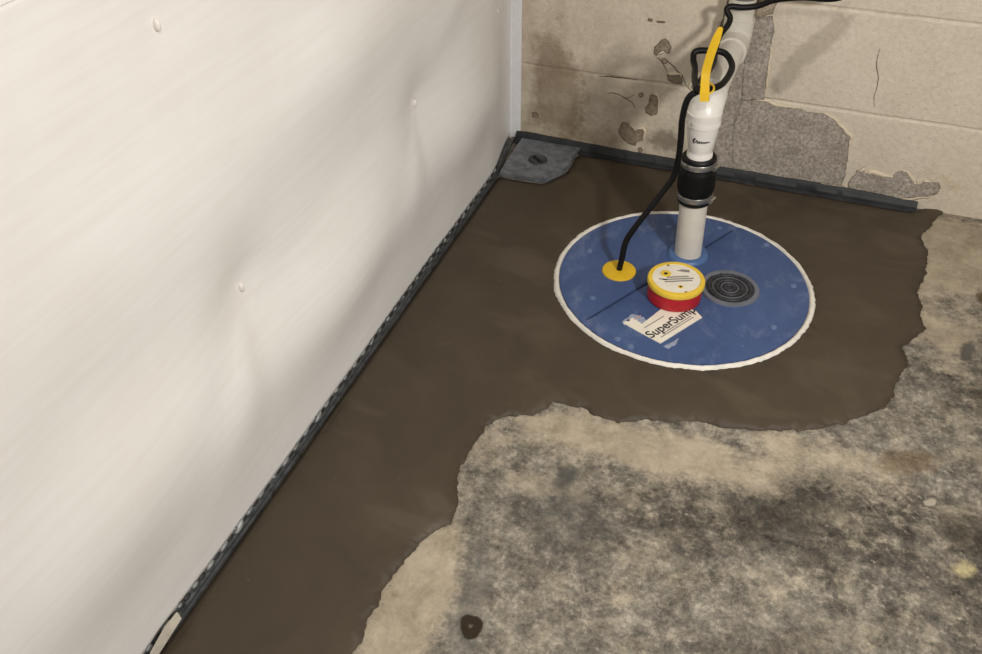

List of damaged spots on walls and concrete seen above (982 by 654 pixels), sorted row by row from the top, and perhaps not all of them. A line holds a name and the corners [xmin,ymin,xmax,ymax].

spalling [653,38,703,91]
spalling [638,92,661,116]
spalling [712,0,941,201]
spalling [618,122,647,153]
leakage [962,343,974,359]
leakage [461,615,483,639]